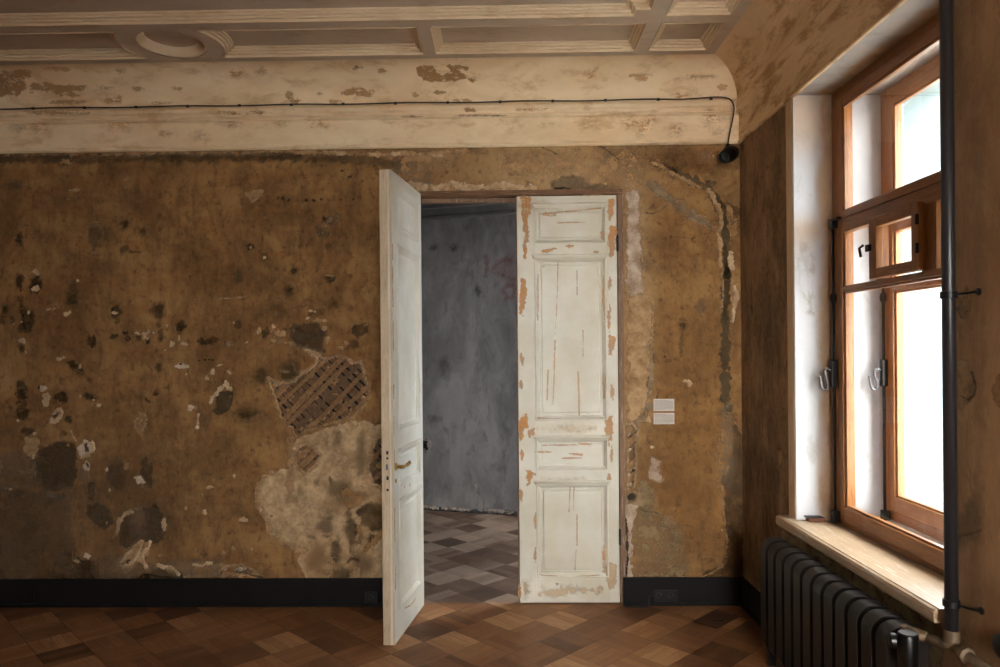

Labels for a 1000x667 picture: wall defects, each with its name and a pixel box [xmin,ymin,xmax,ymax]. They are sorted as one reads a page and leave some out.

peeling [0,70,89,115]
peeling [416,64,474,94]
damp [257,314,369,355]
flaking render [519,183,654,422]
damp [0,416,222,579]
flaking render [239,420,383,578]